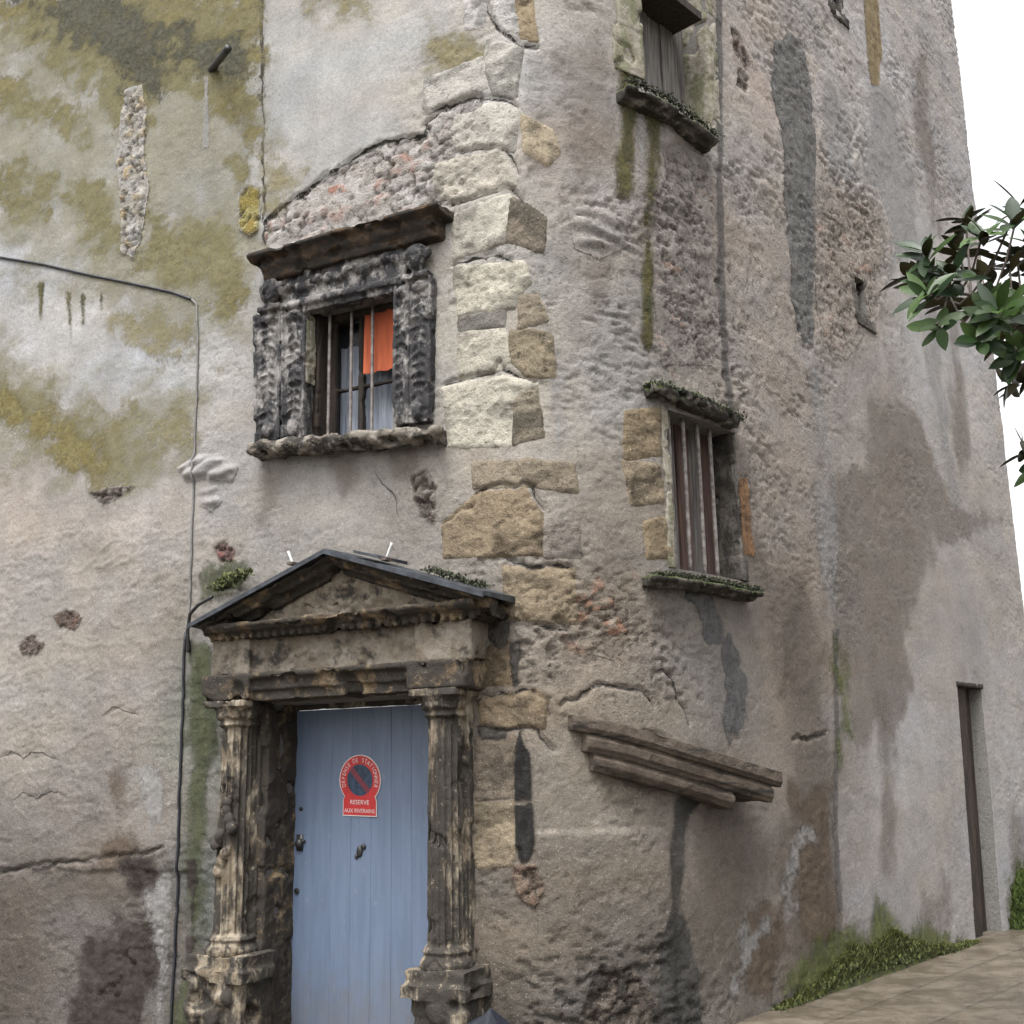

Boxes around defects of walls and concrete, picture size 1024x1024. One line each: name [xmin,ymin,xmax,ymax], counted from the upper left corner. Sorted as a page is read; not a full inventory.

damp [66,291,86,324]
flaking render [116,85,149,257]
flaking render [237,96,484,249]
damp [639,115,662,350]
damp [823,83,914,273]
flaking render [17,634,44,654]
flaking render [53,608,83,629]
flaking render [89,485,132,503]
crack [480,668,692,749]
damp [817,489,858,646]
crack [3,845,161,872]
damp [67,836,170,1024]